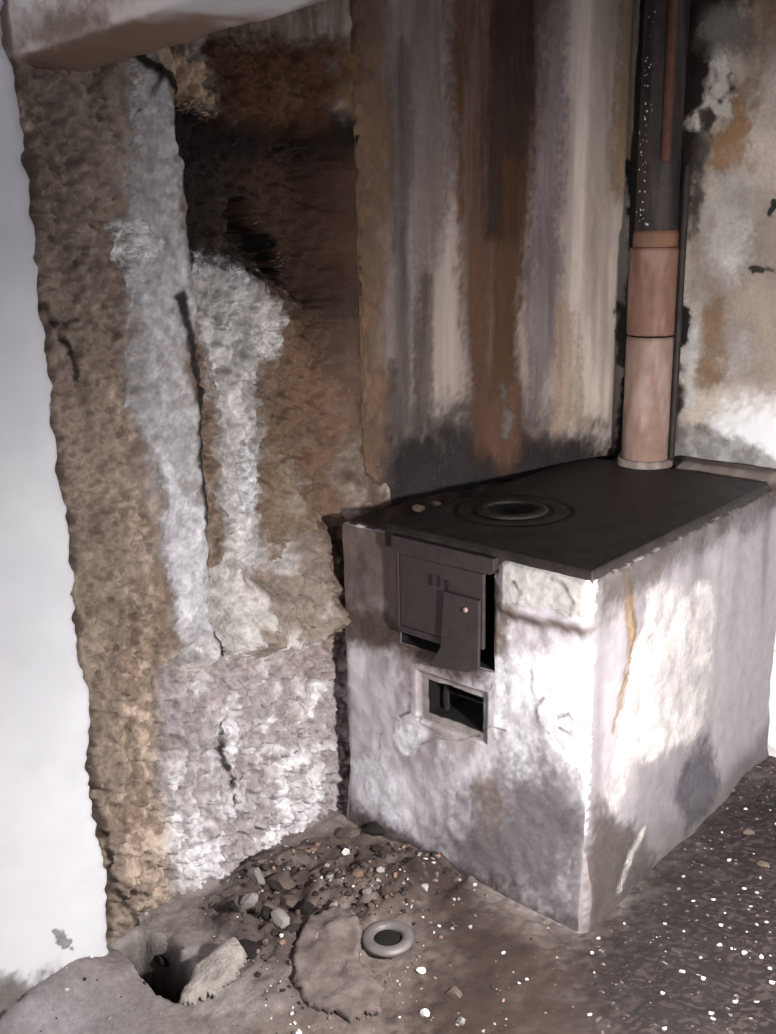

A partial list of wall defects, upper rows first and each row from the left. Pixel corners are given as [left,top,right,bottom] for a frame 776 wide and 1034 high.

water stain [350,0,433,487]
water stain [486,0,535,392]
water stain [676,0,776,433]
flaking render [33,47,288,945]